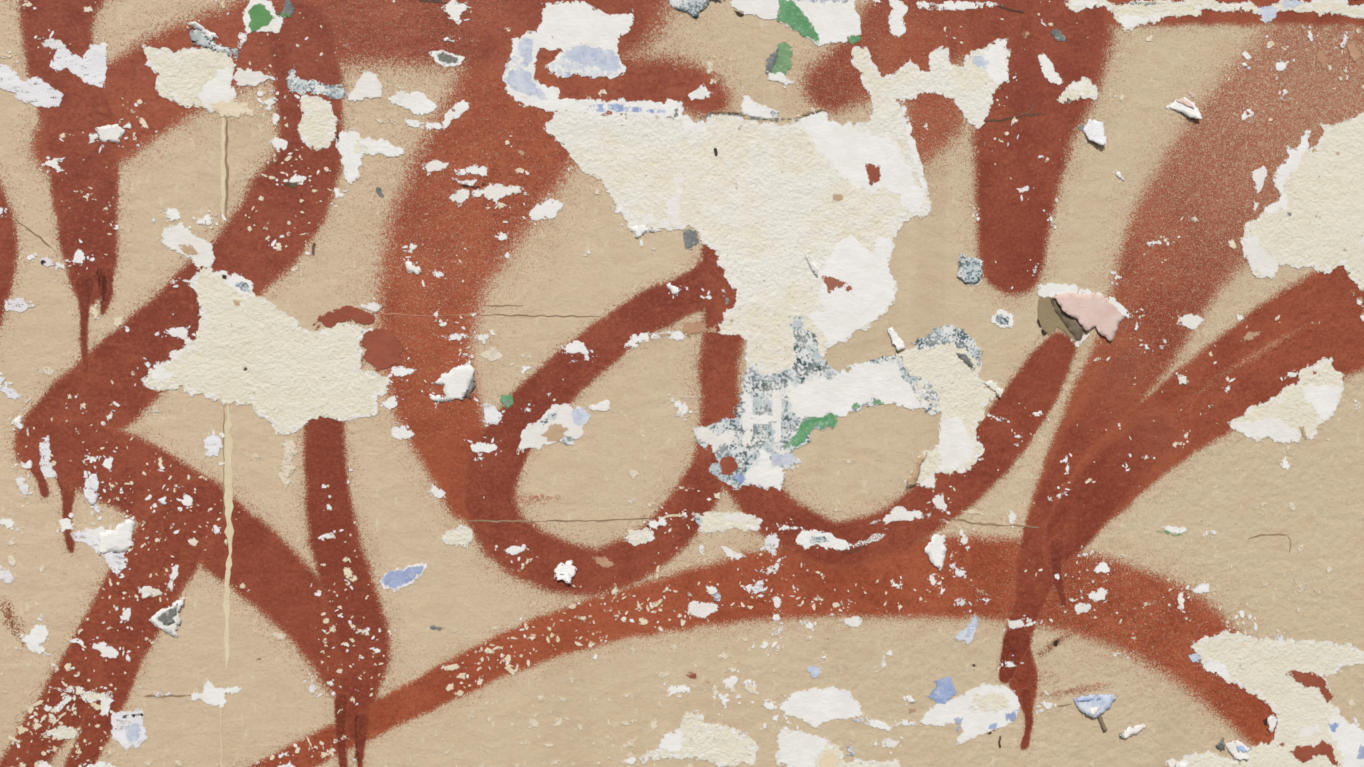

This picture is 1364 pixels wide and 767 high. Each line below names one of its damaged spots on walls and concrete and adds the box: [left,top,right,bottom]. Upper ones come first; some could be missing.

peeling [0,29,111,108]
peeling [4,297,35,313]
peeling [90,301,130,332]
peeling [131,208,532,491]
peeling [422,0,1364,767]
peeling [0,372,242,767]
peeling [303,521,396,714]
peeling [256,736,347,767]